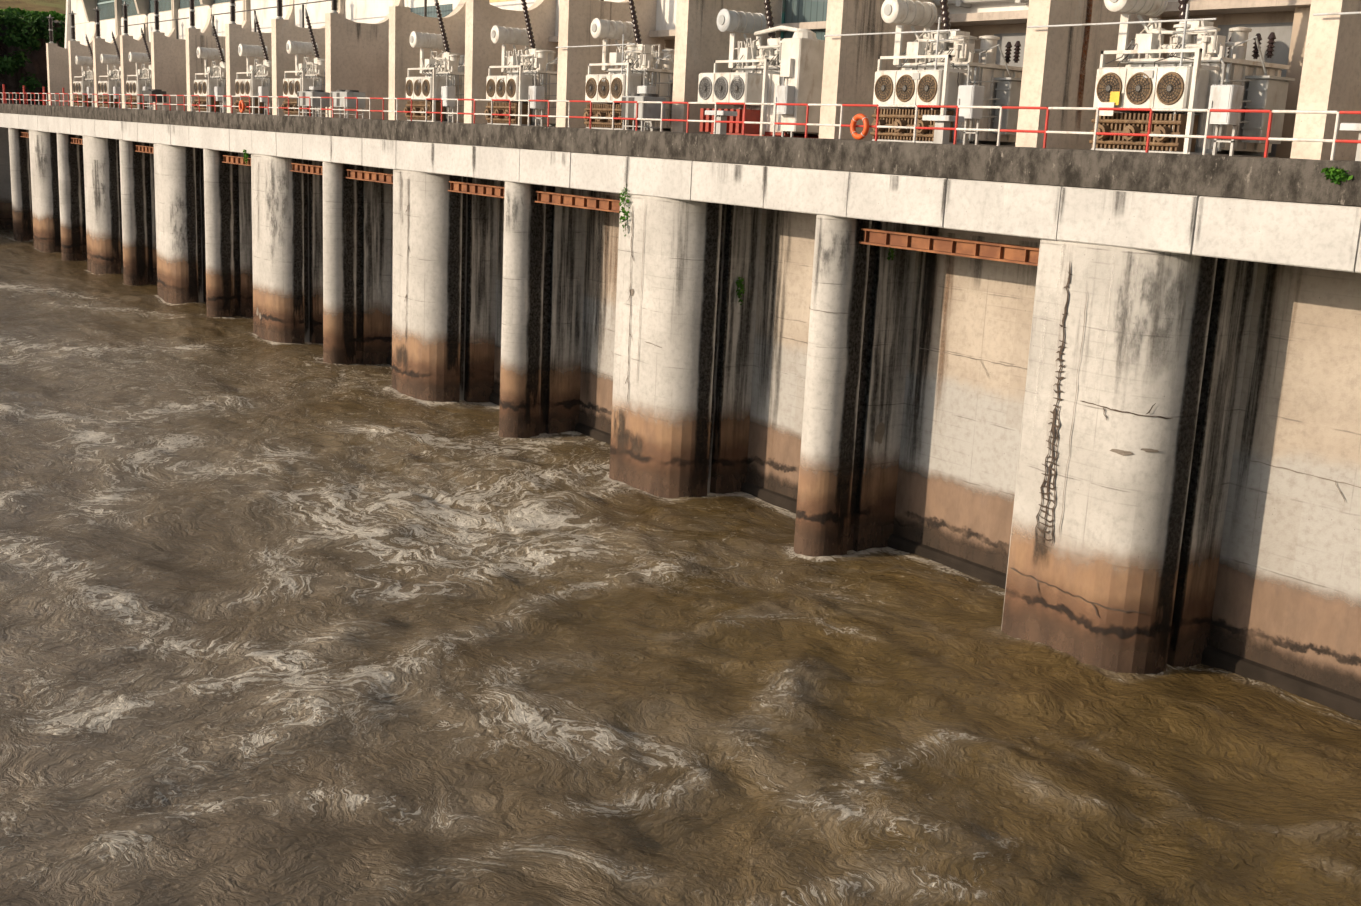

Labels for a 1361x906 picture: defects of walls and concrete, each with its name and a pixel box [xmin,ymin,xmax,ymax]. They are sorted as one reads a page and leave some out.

damp [0,129,1361,699]
crack [917,264,1171,546]
crack [1011,568,1144,619]